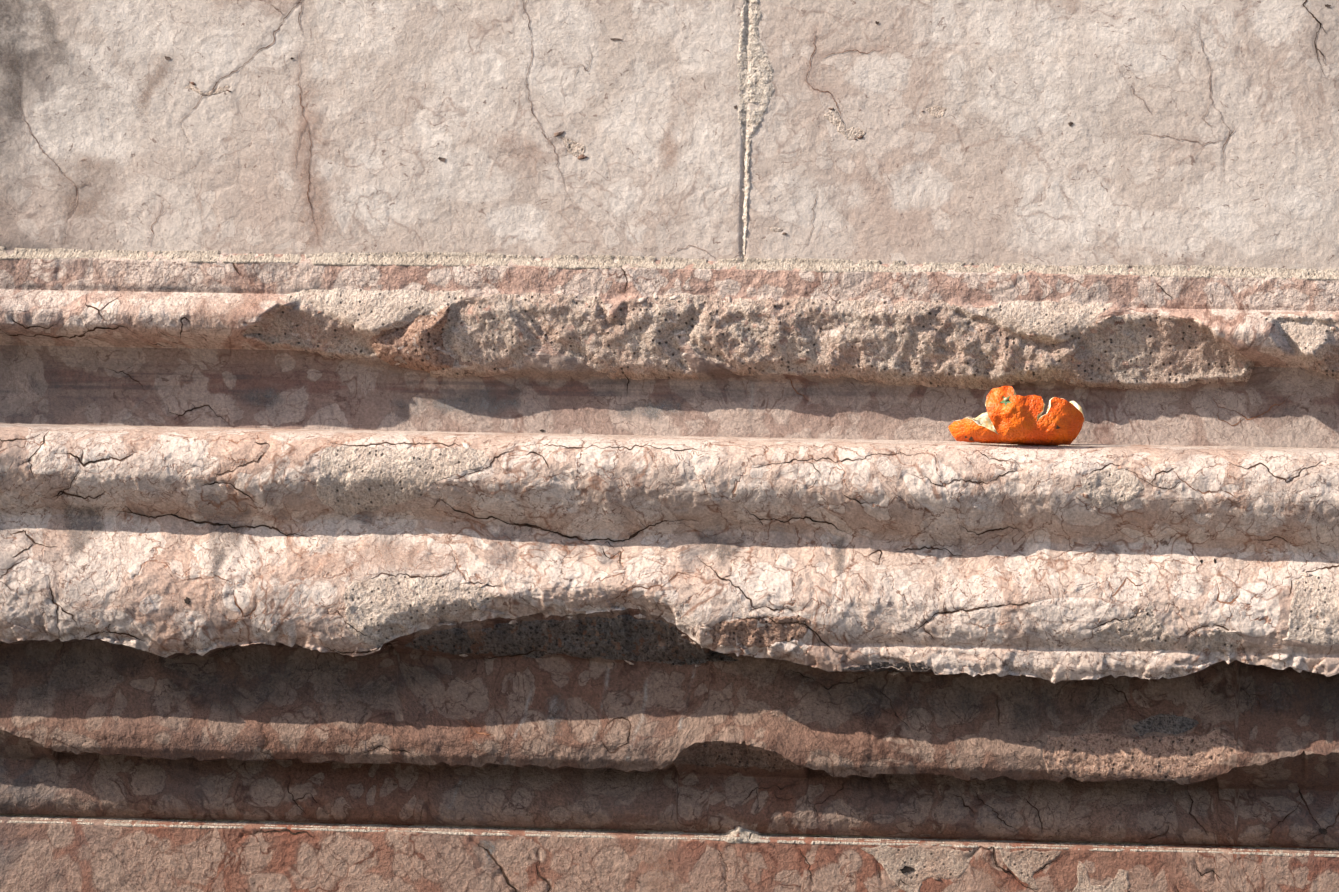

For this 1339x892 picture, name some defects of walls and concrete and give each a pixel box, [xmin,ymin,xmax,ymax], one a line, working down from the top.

crack [180,0,318,241]
spalling [242,292,1254,446]
crack [0,431,316,540]
crack [746,450,1021,533]
crack [1082,460,1338,502]
crack [0,530,143,641]
spalling [401,612,811,667]
crack [326,442,909,727]
spalling [842,659,938,676]
crack [914,599,1045,640]
crack [1082,577,1145,630]
spalling [1185,628,1243,655]